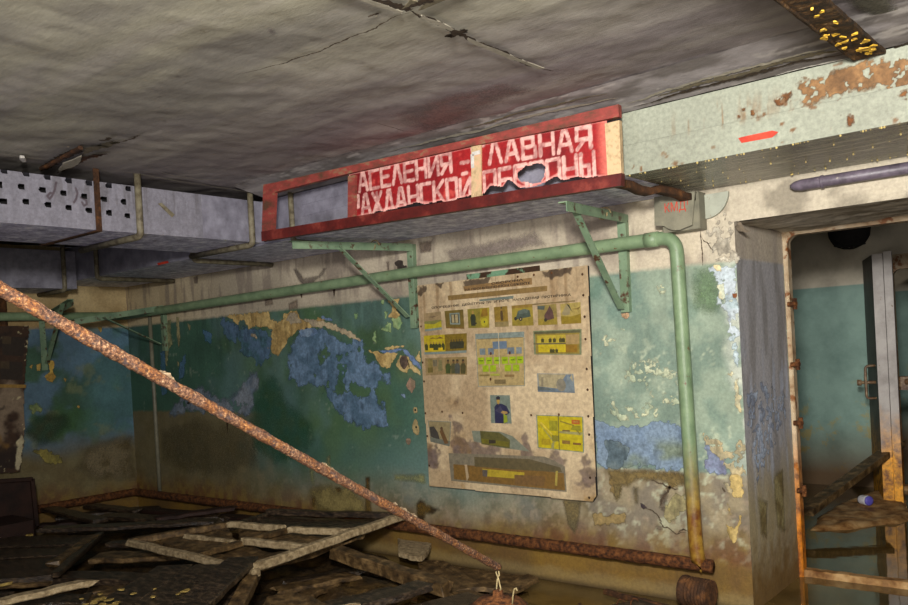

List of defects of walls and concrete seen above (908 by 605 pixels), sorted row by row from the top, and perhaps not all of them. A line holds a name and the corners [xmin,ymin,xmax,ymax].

crack [246,0,551,73]
crack [2,135,139,173]
peeling [160,317,190,395]
peeling [195,299,421,431]
peeling [703,213,786,498]
peeling [169,397,213,417]
spalling [406,407,420,445]
crack [640,480,687,535]
peeling [726,508,742,543]
peeling [759,469,785,537]